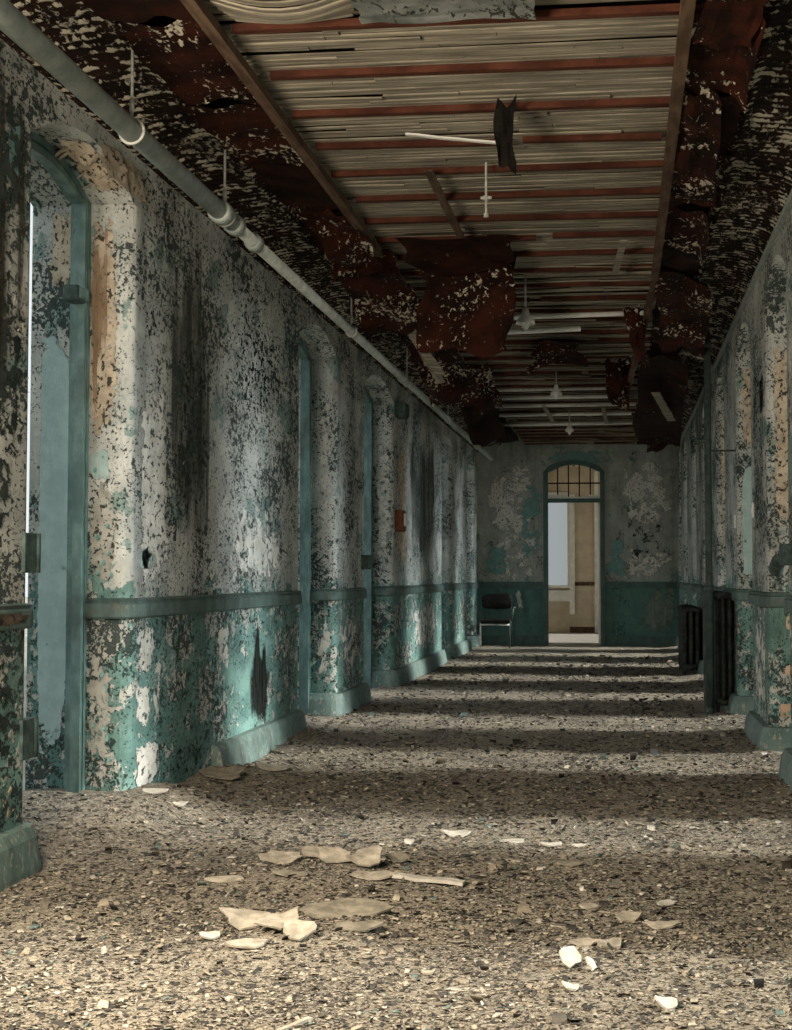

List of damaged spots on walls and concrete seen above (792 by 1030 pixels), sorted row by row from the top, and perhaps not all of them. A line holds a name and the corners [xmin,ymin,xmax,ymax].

peeling [143,304,157,345]
leakage [172,276,209,512]
peeling [230,304,285,429]
peeling [139,327,209,586]
spalling [740,332,789,576]
peeling [228,506,284,587]
peeling [485,465,536,582]
peeling [620,462,673,578]
peeling [136,621,161,728]
peeling [216,624,229,673]
spalling [136,734,208,787]